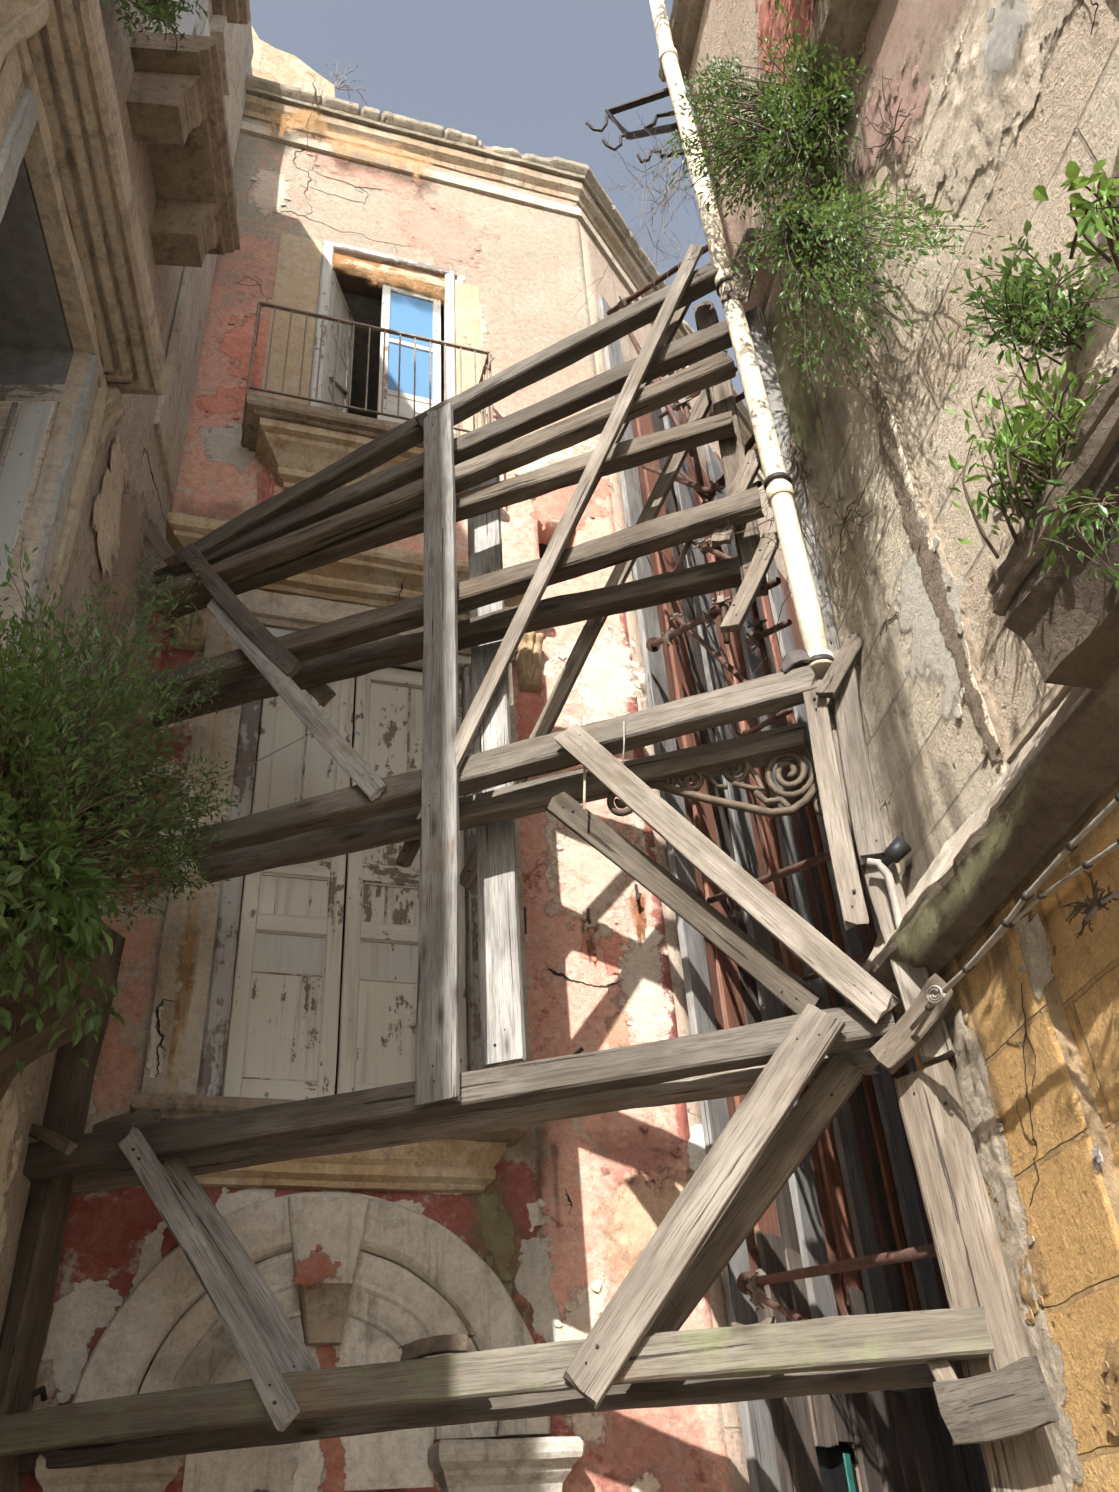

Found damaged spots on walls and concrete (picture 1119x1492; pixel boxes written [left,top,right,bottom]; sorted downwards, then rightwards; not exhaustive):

peeling [755,0,819,84]
crack [271,72,419,250]
peeling [195,314,279,474]
peeling [551,623,647,726]
crack [536,967,623,993]
peeling [544,809,675,1049]
peeling [686,1124,706,1171]
crack [1007,983,1039,1207]
peeling [33,1221,167,1410]
peeling [514,1199,641,1343]
peeling [292,1440,346,1492]
peeling [564,1412,606,1447]